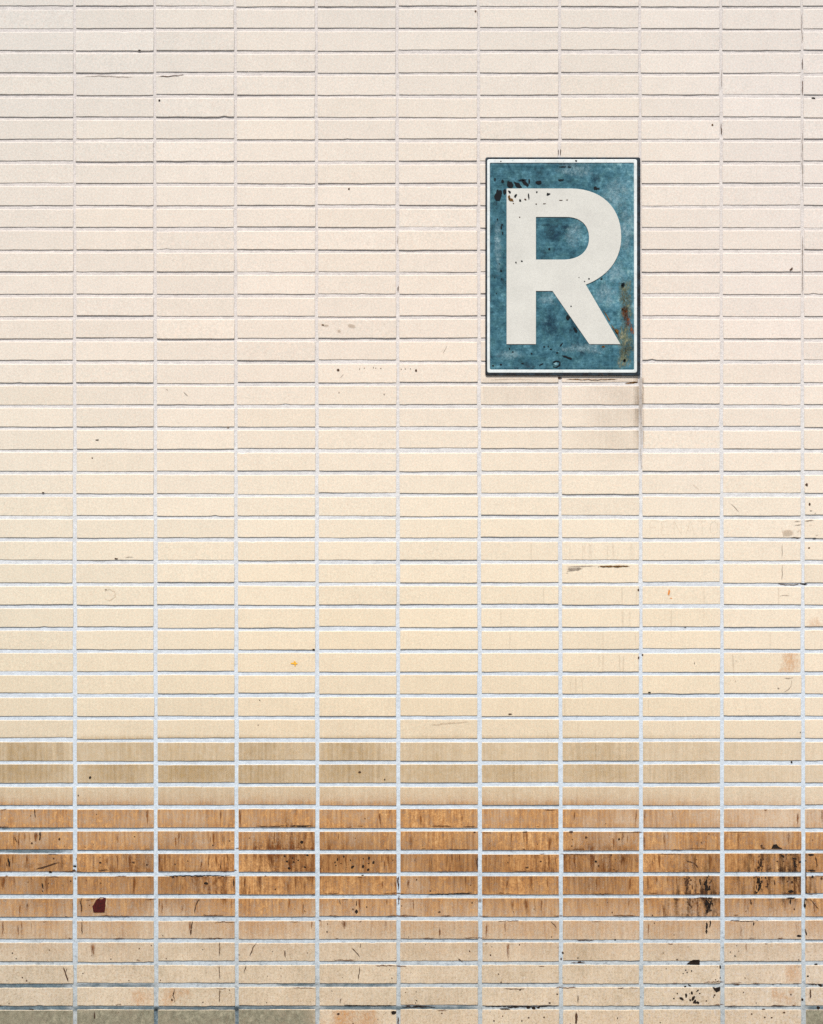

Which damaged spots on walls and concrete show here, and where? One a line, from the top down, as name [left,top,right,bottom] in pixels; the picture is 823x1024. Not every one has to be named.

damp [684,860,713,934]
damp [750,856,775,904]